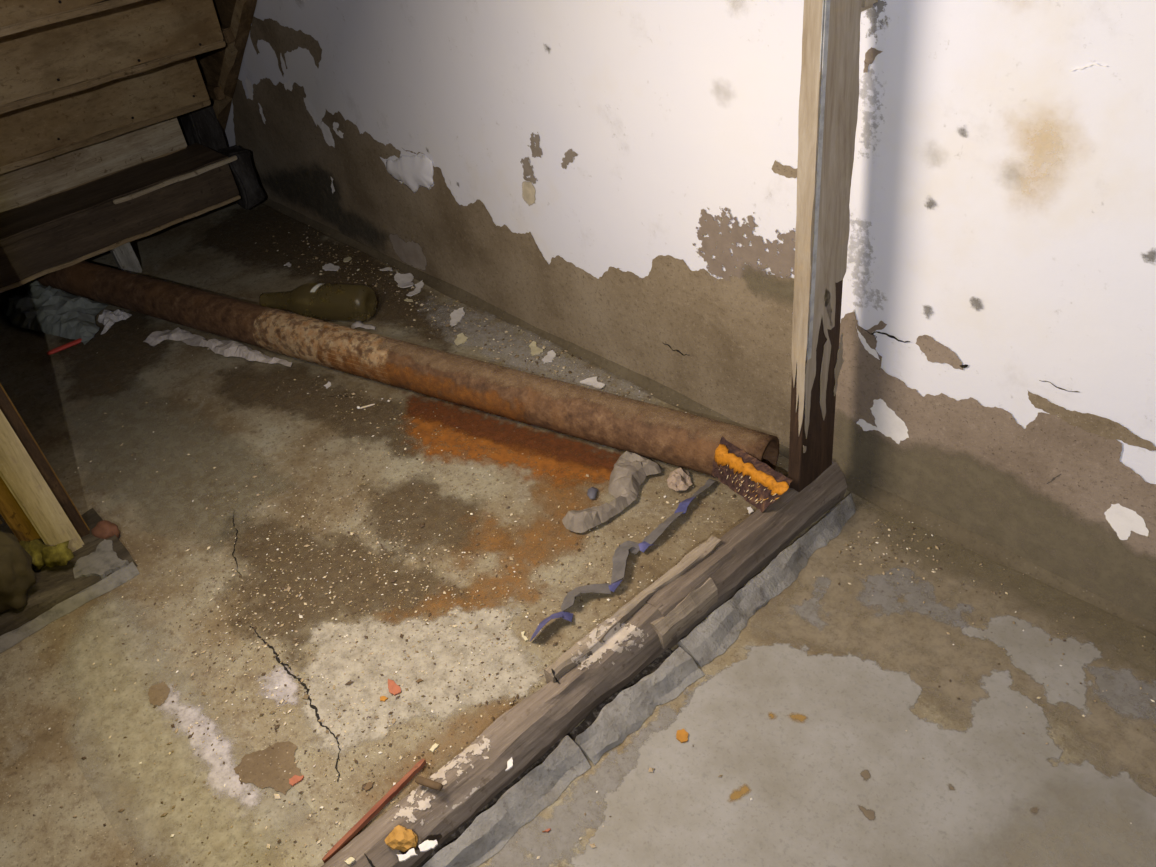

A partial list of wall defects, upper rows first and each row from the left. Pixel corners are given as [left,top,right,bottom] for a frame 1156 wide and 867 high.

peeling [232,16,797,448]
leakage [59,311,166,400]
leakage [426,303,640,399]
peeling [824,289,1156,569]
crack [232,508,241,575]
rust [385,395,621,620]
crack [249,626,341,782]
spalling [859,806,875,820]